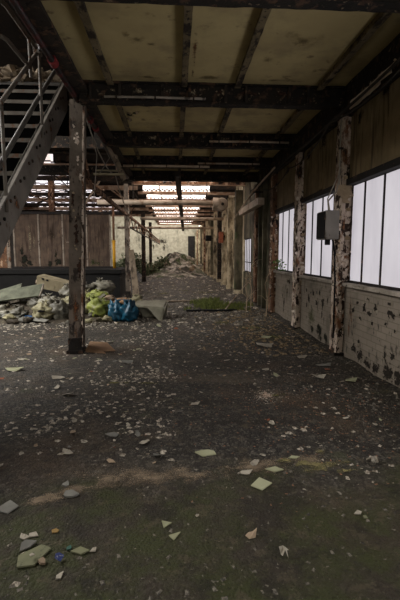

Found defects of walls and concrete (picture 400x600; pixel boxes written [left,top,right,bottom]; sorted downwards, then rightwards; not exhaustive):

peeling [268,165,354,335]
spalling [351,340,400,386]